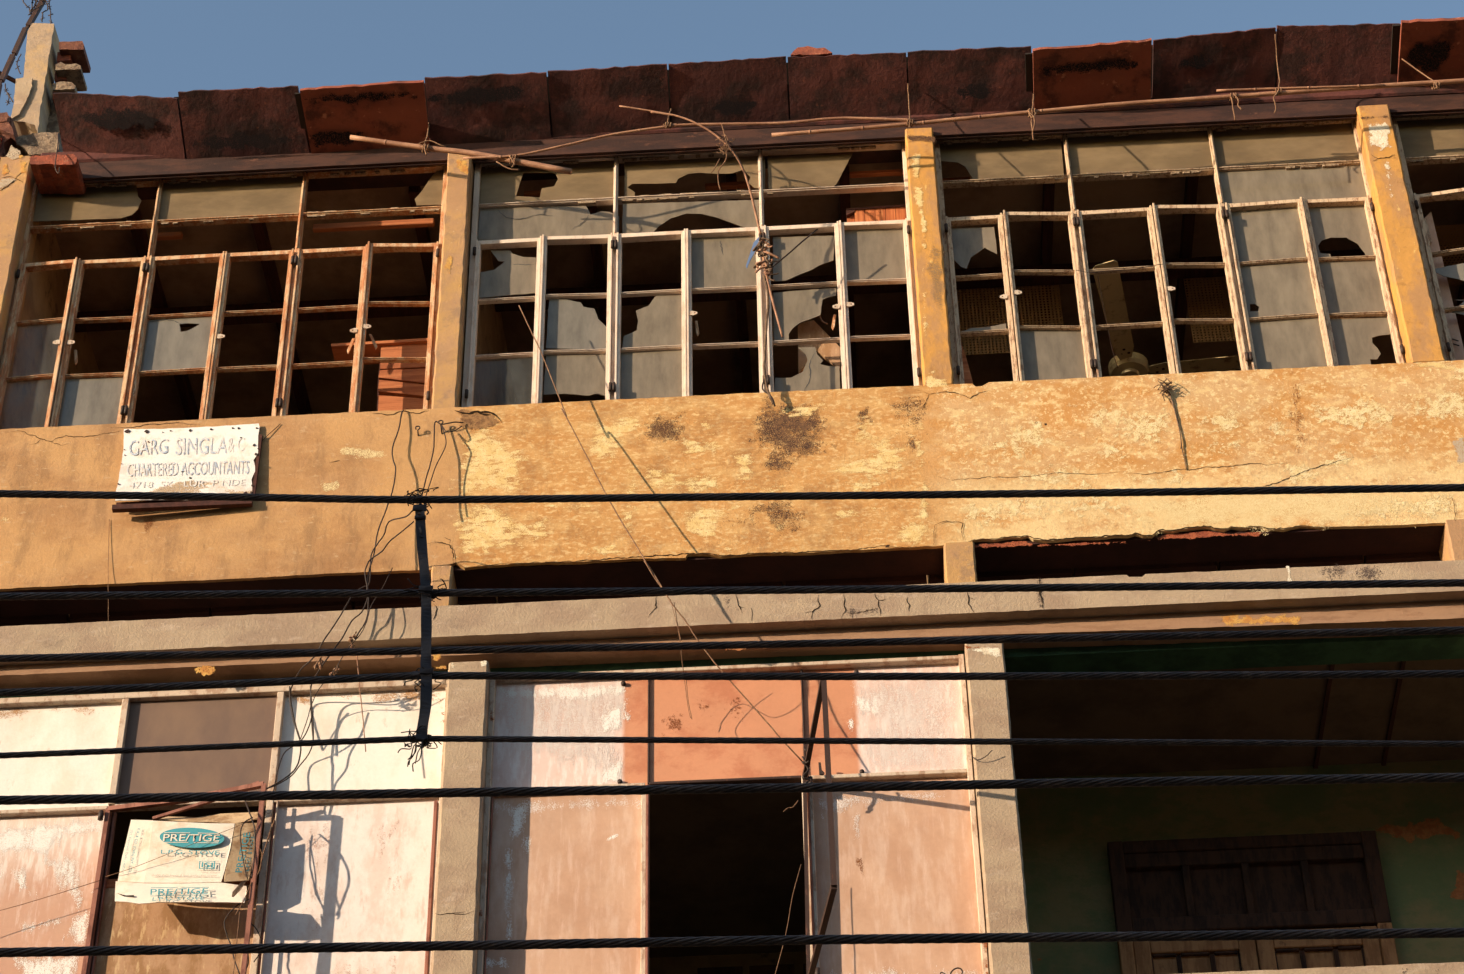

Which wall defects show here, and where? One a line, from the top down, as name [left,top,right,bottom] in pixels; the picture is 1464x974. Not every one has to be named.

damp [712,396,838,538]